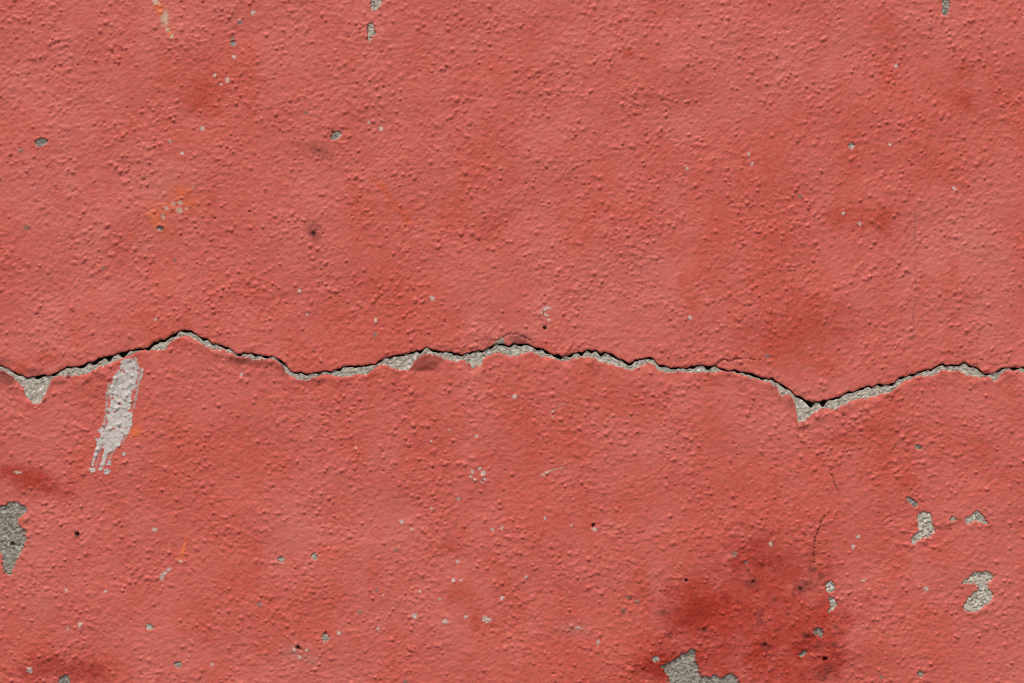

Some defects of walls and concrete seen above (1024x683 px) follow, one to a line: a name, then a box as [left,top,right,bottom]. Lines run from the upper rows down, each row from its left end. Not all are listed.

crack [0,330,1024,423]
peeling [0,502,28,575]
peeling [906,497,935,545]
peeling [950,510,988,524]
peeling [961,570,994,613]
peeling [652,649,740,683]